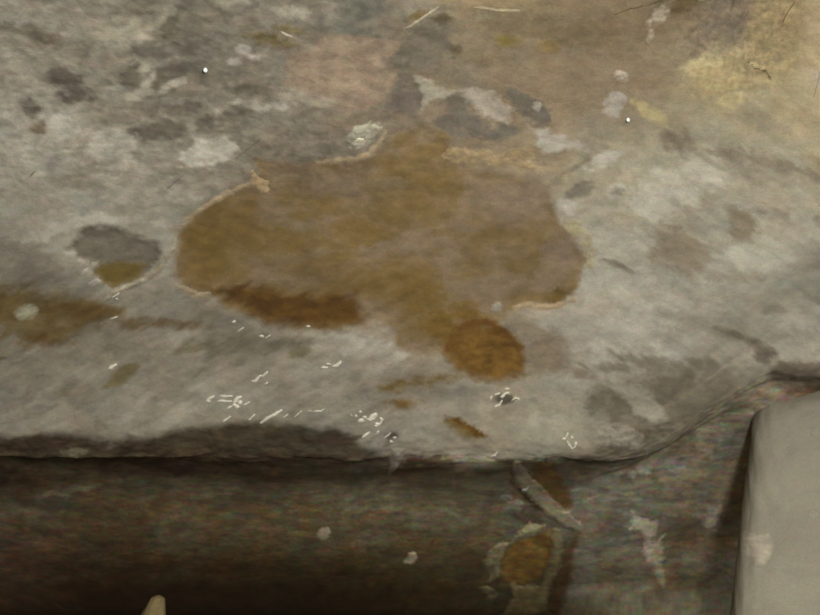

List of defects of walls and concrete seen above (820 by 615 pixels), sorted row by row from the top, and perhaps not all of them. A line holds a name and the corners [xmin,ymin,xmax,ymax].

crack [614,0,667,15]
water stain [378,7,466,121]
water stain [680,0,816,102]
water stain [448,83,554,144]
water stain [91,258,150,290]
spalling [521,455,579,514]